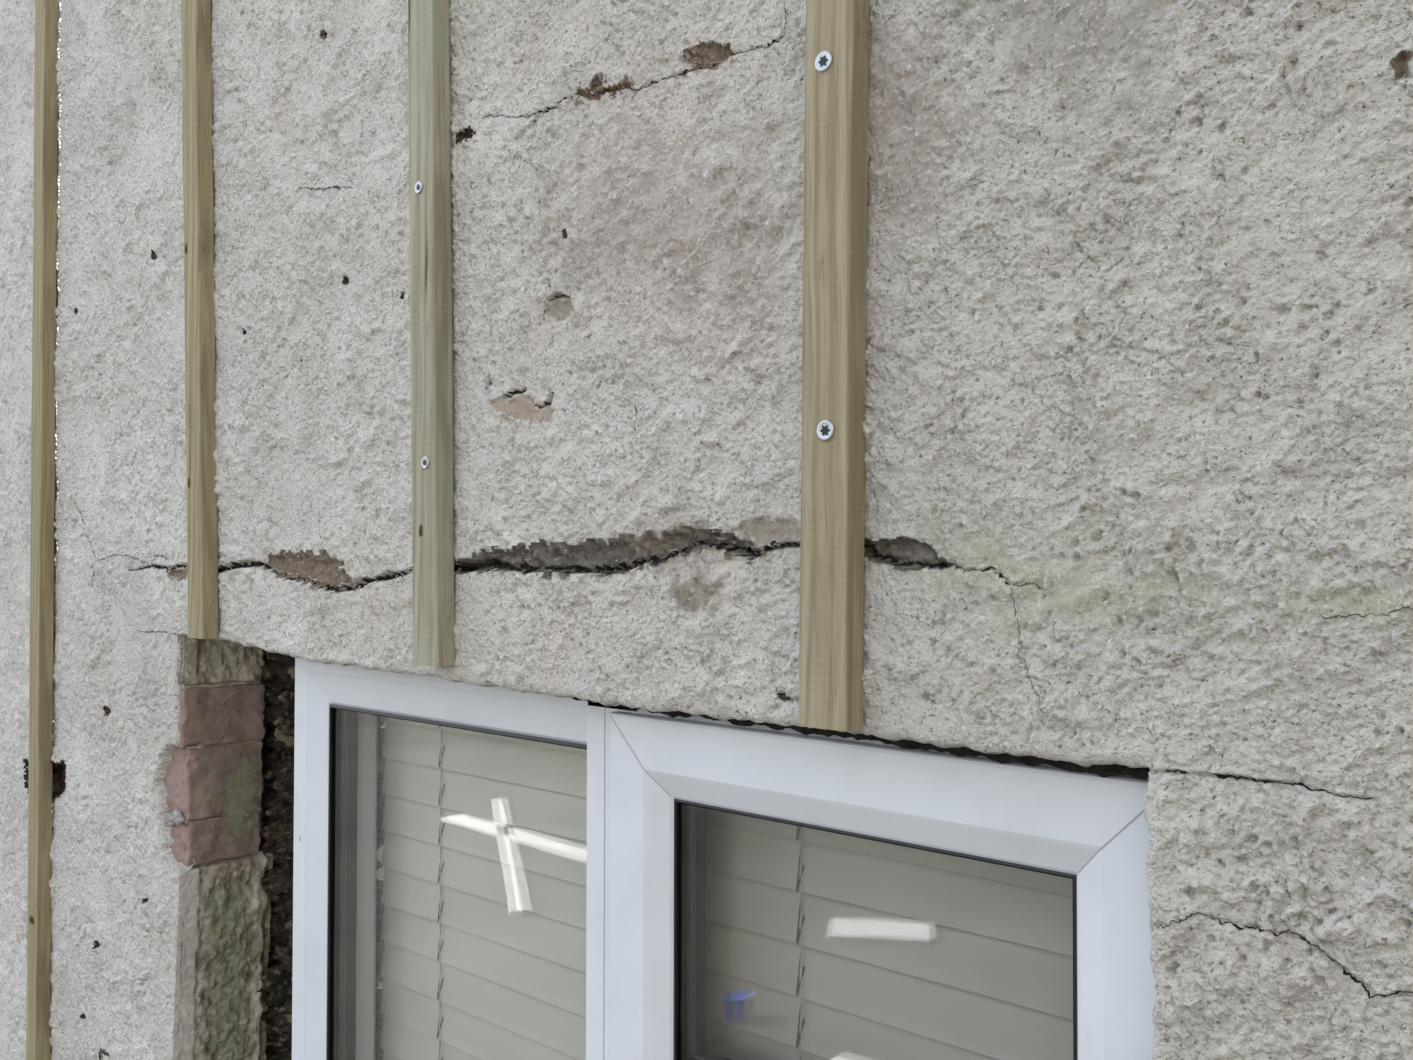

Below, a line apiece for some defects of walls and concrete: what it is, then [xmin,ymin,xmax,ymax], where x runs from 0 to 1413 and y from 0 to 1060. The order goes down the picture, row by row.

crack [486,3,787,118]
peeling [490,383,554,424]
crack [71,499,412,594]
crack [454,518,800,579]
crack [864,537,1051,721]
crack [1166,769,1378,801]
crack [1154,912,1413,999]